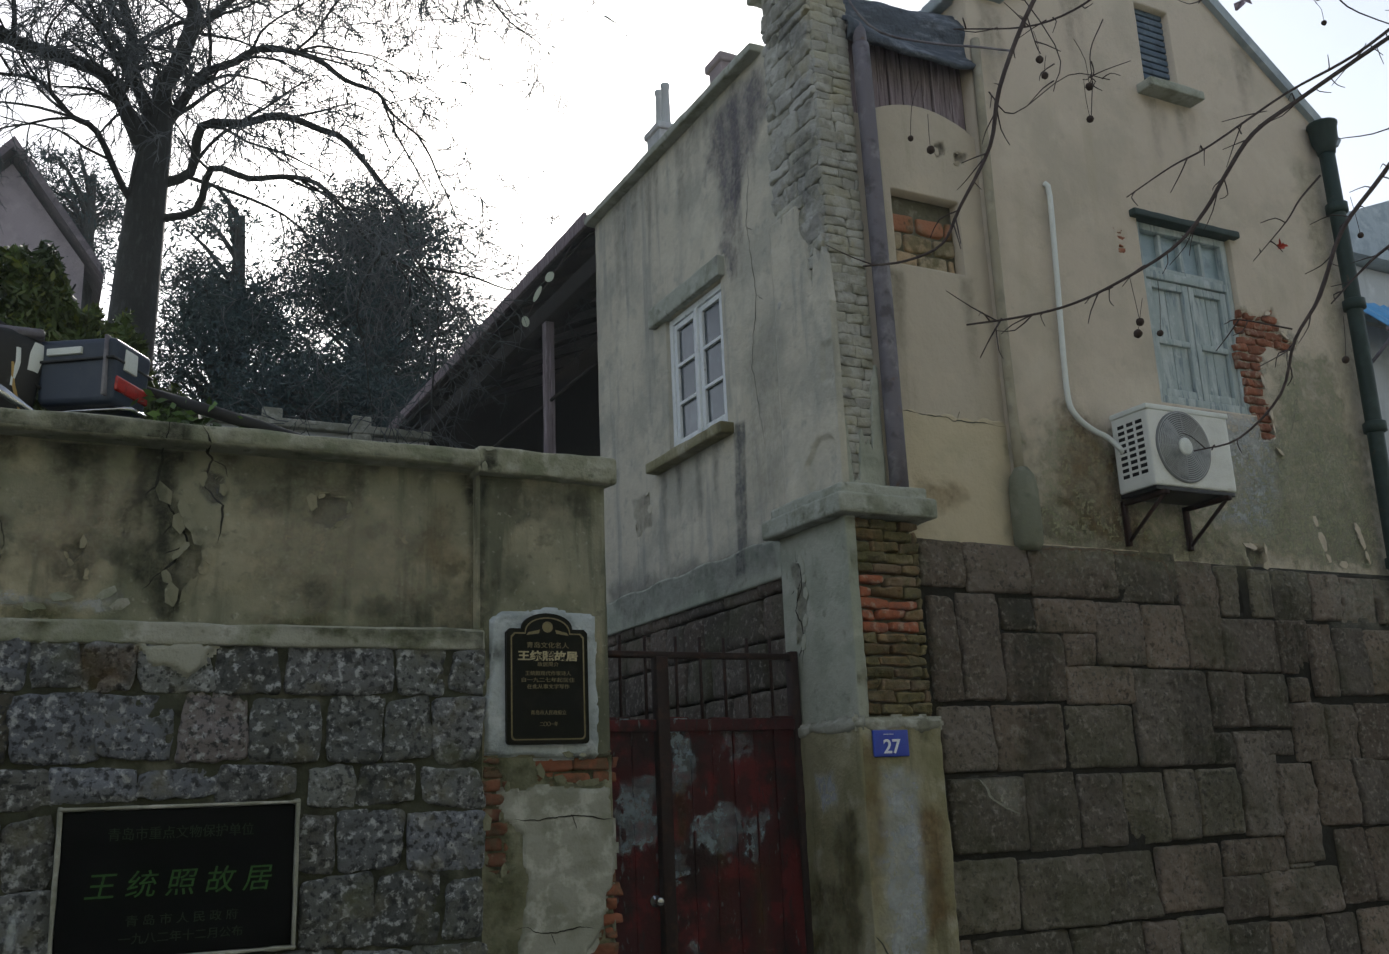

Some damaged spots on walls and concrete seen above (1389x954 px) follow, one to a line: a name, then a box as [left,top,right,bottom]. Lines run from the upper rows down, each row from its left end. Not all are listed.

water stain [708,75,765,273]
flaking render [1231,309,1297,469]
flaking render [155,481,213,607]
crack [144,423,228,611]
spalling [859,575,919,634]
flaking render [474,756,510,883]
flaking render [535,750,657,854]
peeling [670,718,693,795]
peeling [692,802,770,865]
flaking render [587,872,623,954]